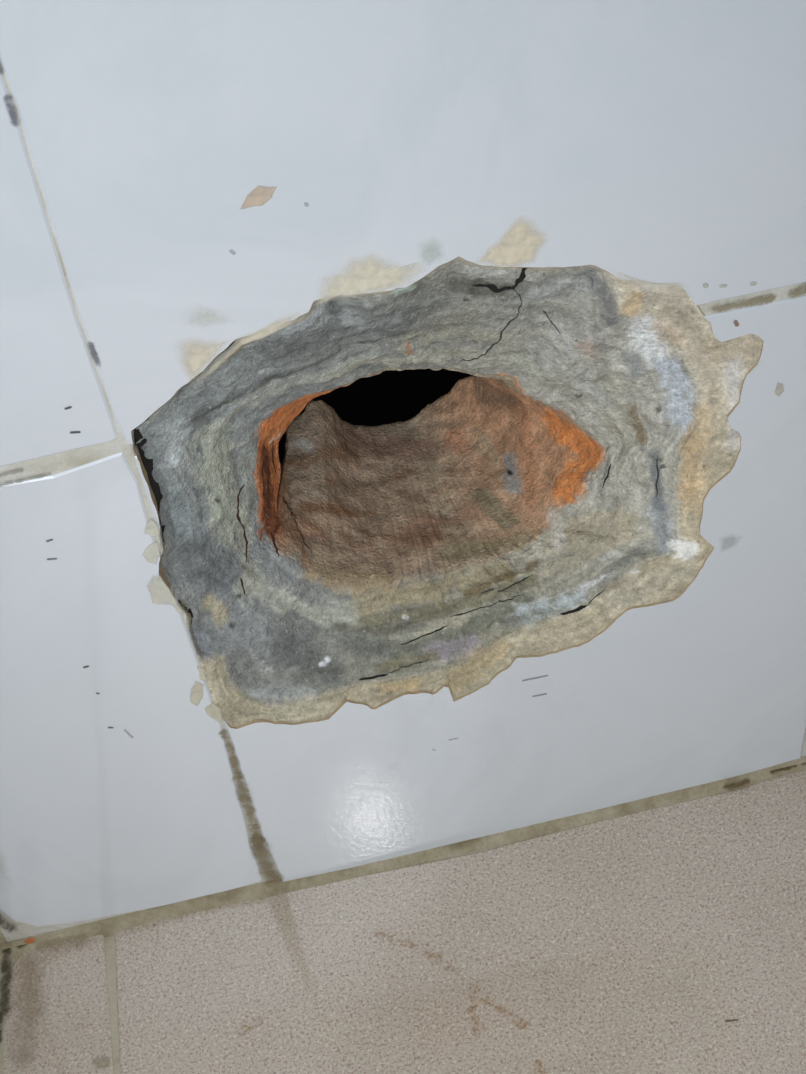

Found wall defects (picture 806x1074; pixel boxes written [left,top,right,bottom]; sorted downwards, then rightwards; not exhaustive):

crack [461,268,560,361]
spalling [131,222,763,727]
water stain [0,944,25,1042]